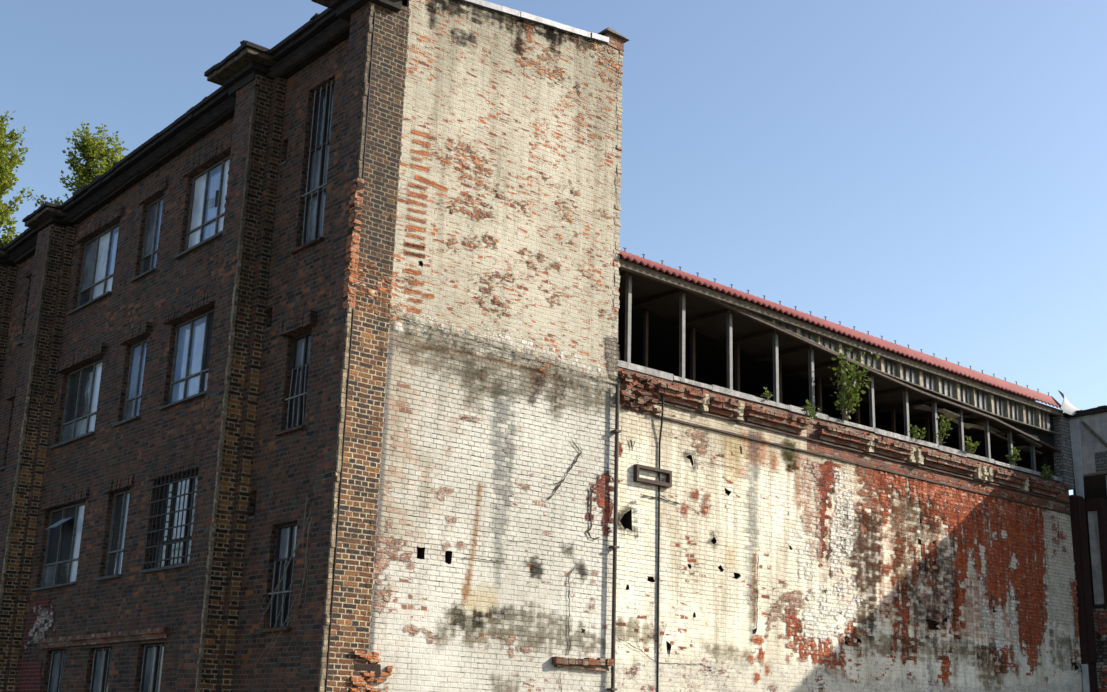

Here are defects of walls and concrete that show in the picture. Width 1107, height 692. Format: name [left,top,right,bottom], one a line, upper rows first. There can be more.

peeling [514,20,582,104]
peeling [563,34,622,89]
spalling [342,130,562,338]
peeling [528,175,580,246]
crack [548,438,600,540]
spalling [586,471,638,538]
peeling [749,460,1067,692]
peeling [24,604,56,649]
crack [560,565,576,692]
spalling [349,650,393,692]